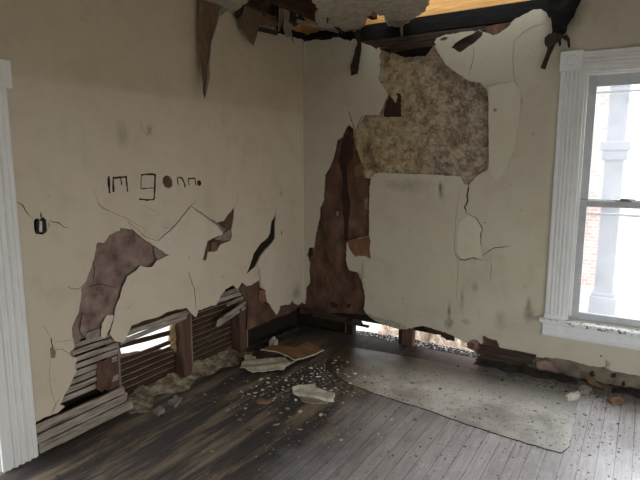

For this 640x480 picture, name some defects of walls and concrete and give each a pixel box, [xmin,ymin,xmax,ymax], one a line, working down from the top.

crack [248,214,282,291]
flaking render [239,46,521,347]
crack [454,186,507,298]
flaking render [36,201,235,424]
flaking render [527,357,640,389]